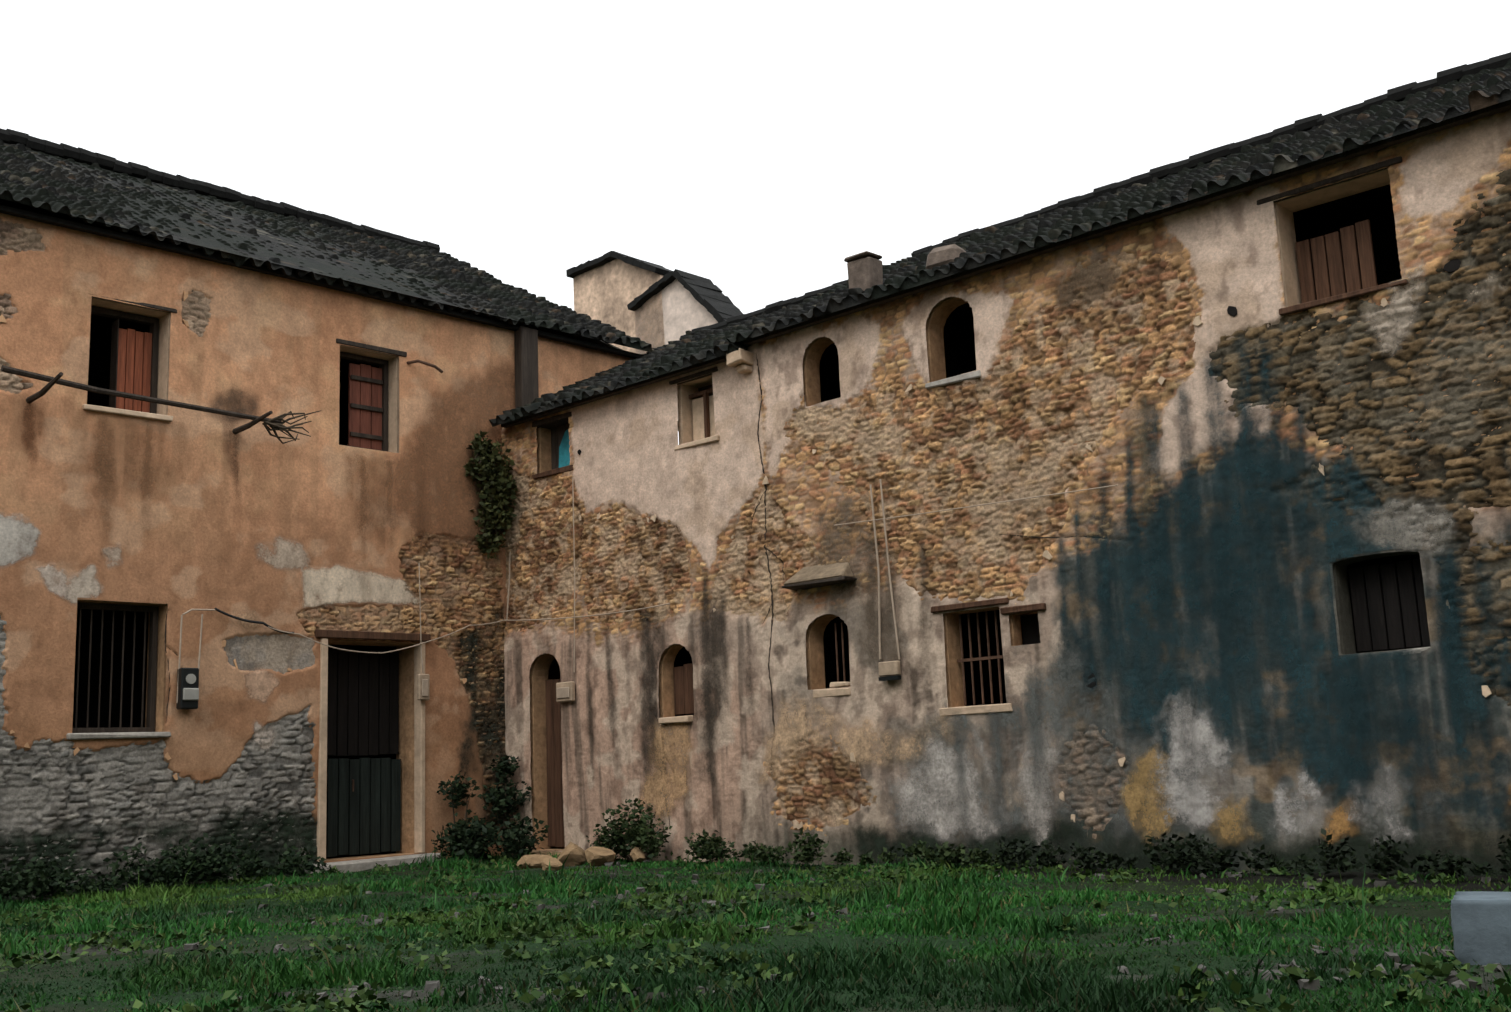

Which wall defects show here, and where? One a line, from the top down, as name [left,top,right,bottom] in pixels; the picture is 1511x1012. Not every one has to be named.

spalling [0,293,18,323]
spalling [0,357,33,394]
spalling [0,218,46,256]
spalling [181,289,213,337]
flaking render [783,169,1511,706]
flaking render [0,616,317,902]
flaking render [222,471,691,826]
leakage [587,627,614,732]
leakage [640,612,664,781]
leakage [697,575,727,780]